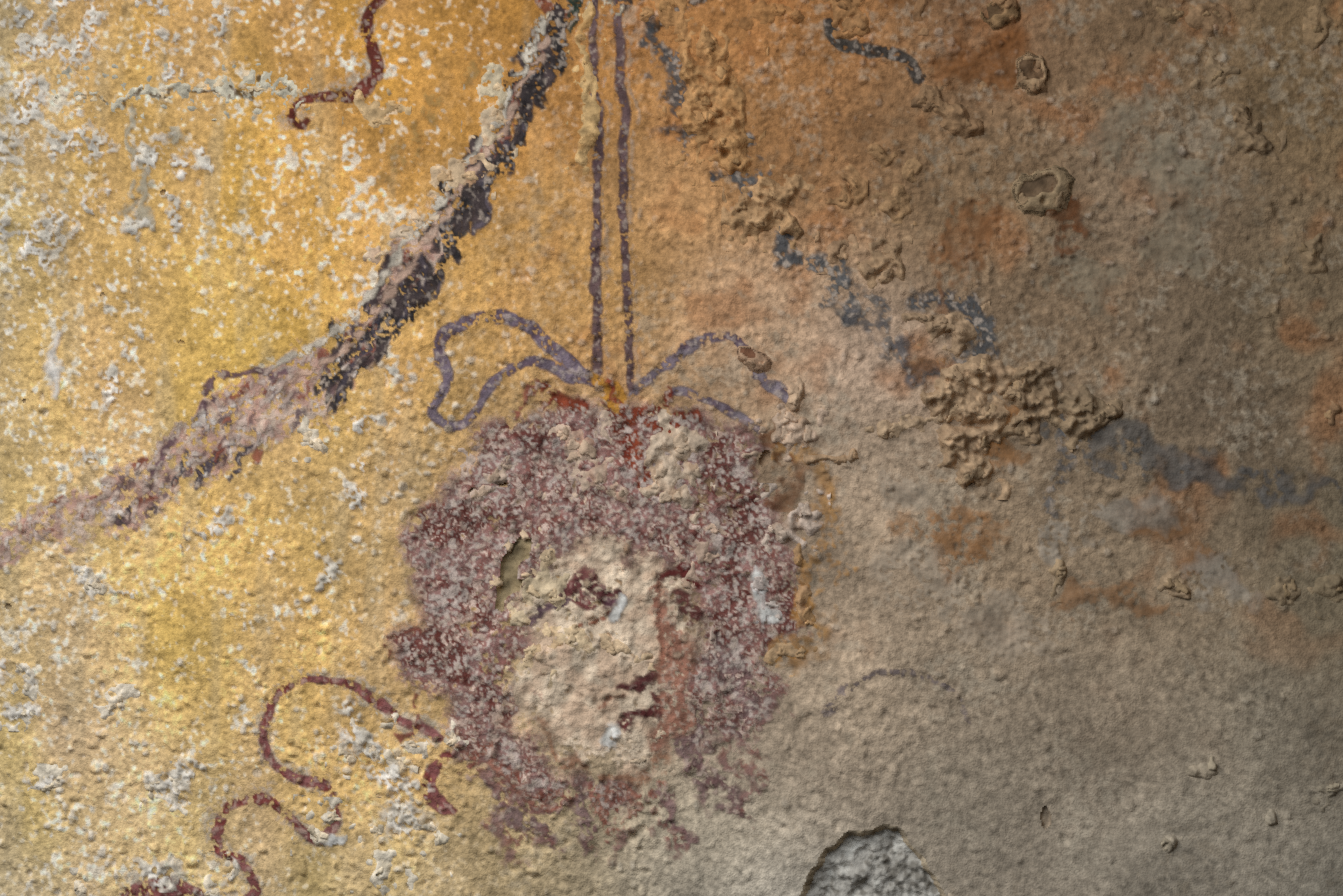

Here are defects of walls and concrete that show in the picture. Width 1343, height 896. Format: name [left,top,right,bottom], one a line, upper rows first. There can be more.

spalling [489,523,537,612]
spalling [799,824,953,896]